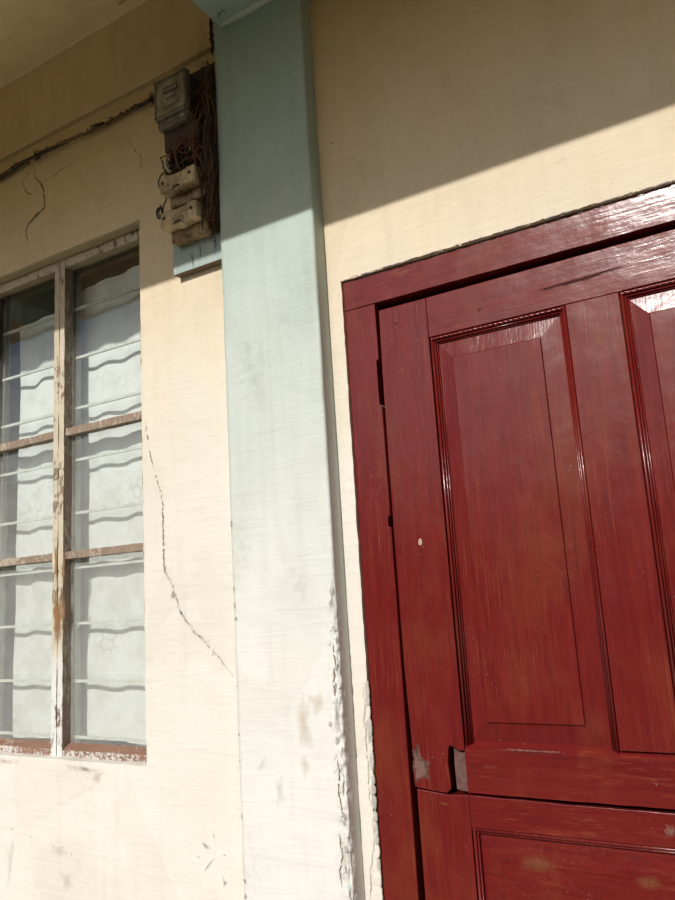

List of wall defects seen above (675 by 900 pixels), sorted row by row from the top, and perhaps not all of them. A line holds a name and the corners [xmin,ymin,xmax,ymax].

crack [1,142,78,242]
crack [145,422,235,689]
spalling [327,577,351,900]